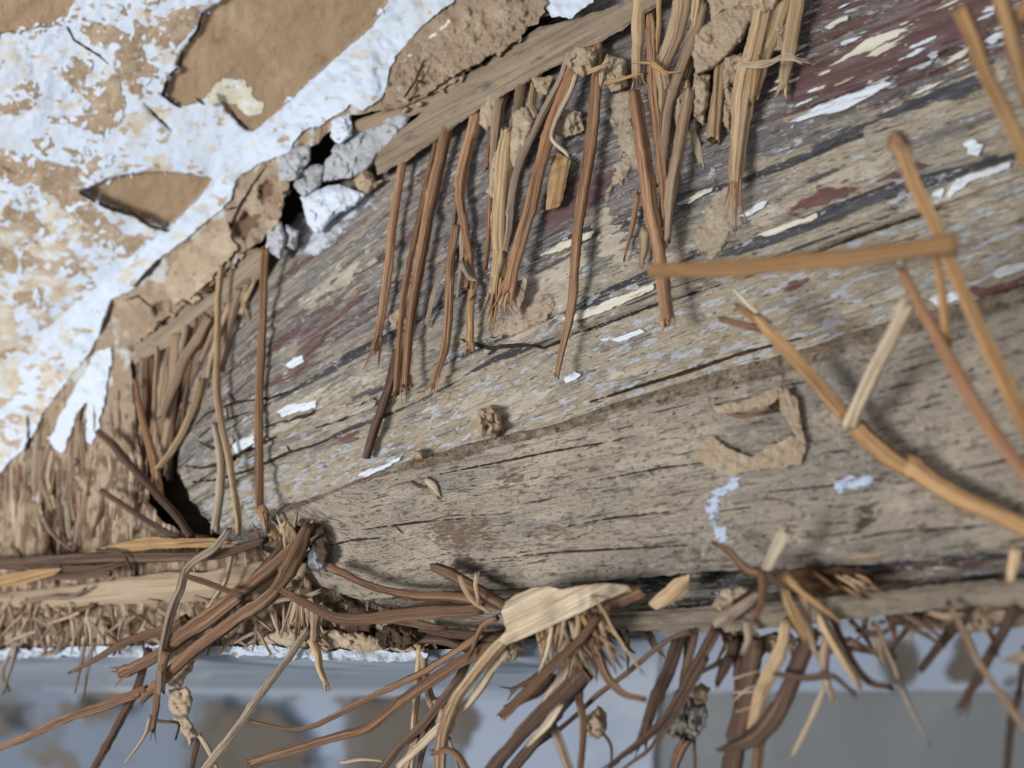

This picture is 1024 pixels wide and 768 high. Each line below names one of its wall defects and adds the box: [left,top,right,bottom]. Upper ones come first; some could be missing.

peeling [544,0,593,19]
flaking render [0,0,388,274]
peeling [58,254,95,292]
peeling [13,287,44,309]
peeling [0,348,17,360]
peeling [47,347,112,453]
spalling [768,398,781,413]
peeling [0,644,159,660]
peeling [198,644,428,663]